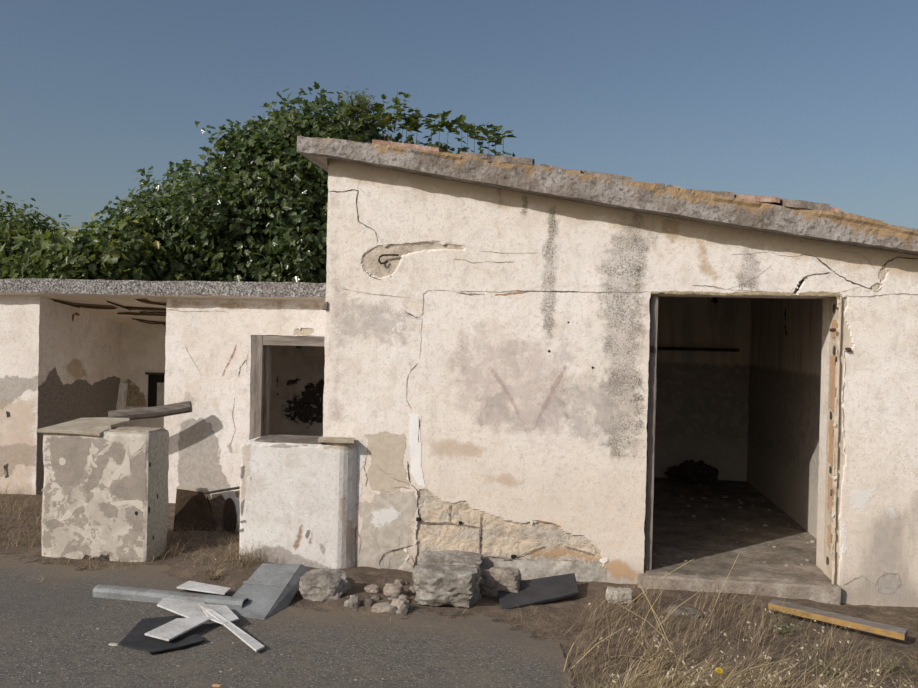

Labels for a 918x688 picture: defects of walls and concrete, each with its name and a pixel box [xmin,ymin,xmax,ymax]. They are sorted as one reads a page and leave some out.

crack [328,178,428,245]
water stain [542,213,558,331]
water stain [603,218,652,456]
crack [693,251,918,297]
flaking render [42,436,154,561]
flaking render [356,432,417,571]
crack [345,271,647,568]
spalling [651,291,853,584]